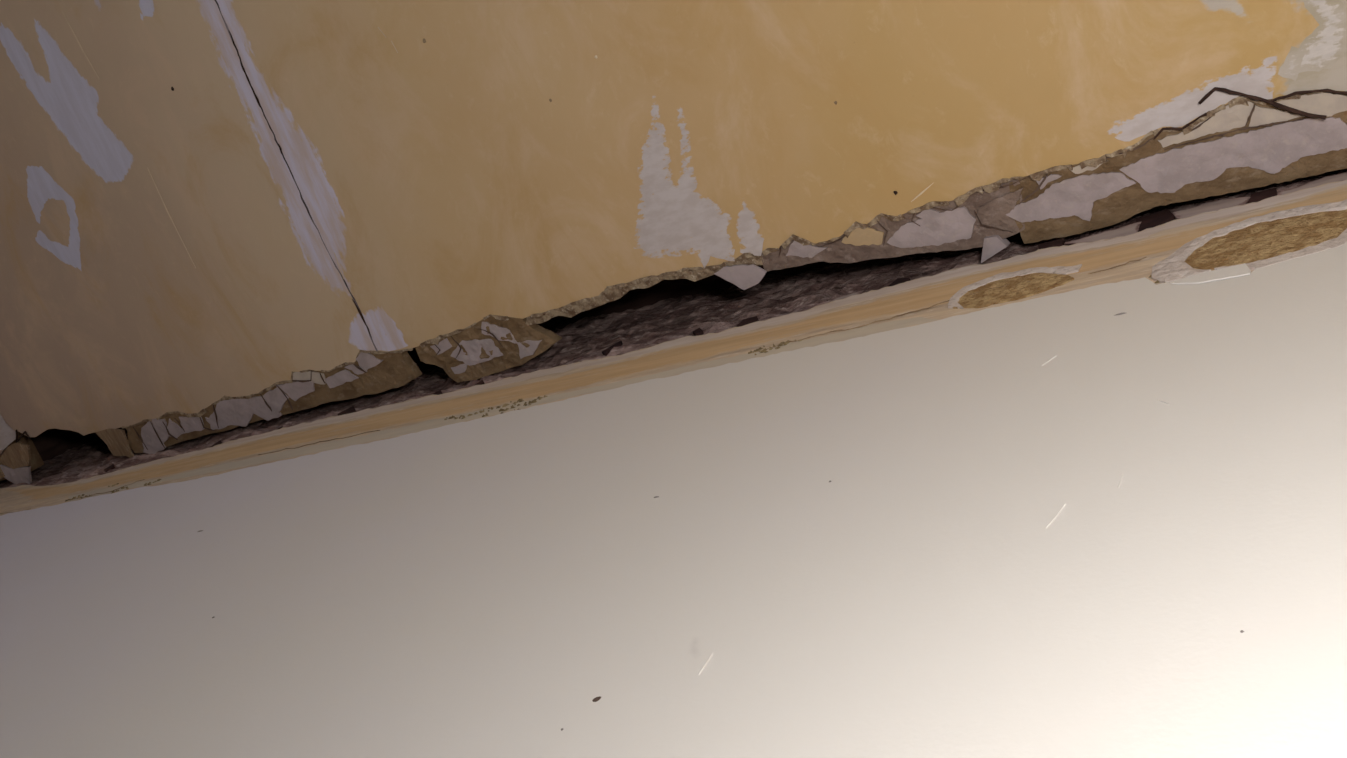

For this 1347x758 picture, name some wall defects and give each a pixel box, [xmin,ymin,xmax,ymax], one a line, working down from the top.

crack [214,0,378,351]
flaking render [0,0,1347,516]